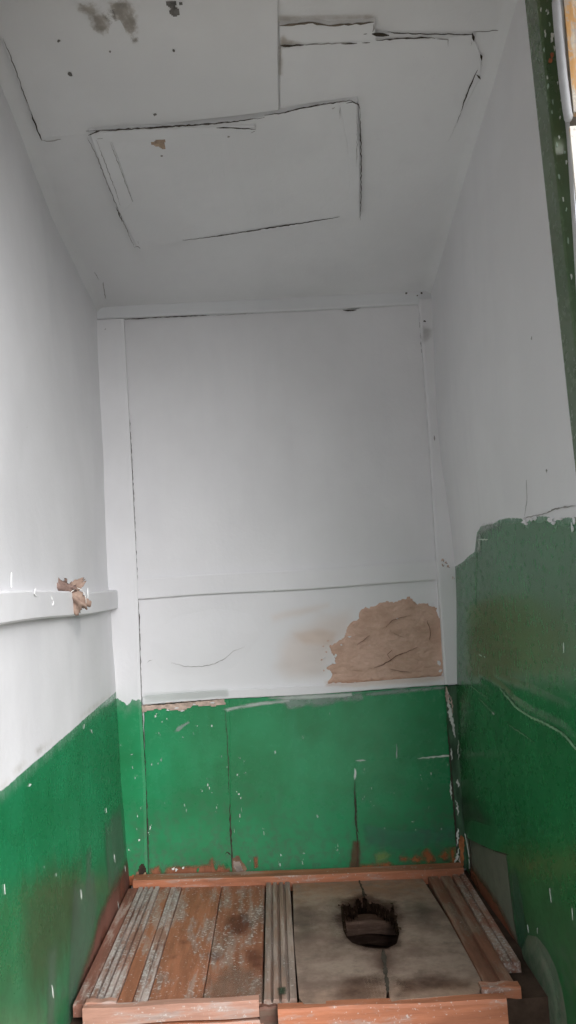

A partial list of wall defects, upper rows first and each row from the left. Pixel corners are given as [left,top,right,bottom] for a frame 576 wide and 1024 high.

crack [4,42,61,142]
crack [280,22,498,123]
crack [88,100,362,247]
peeling [521,516,575,532]
peeling [142,699,226,734]
flaking render [321,597,518,944]